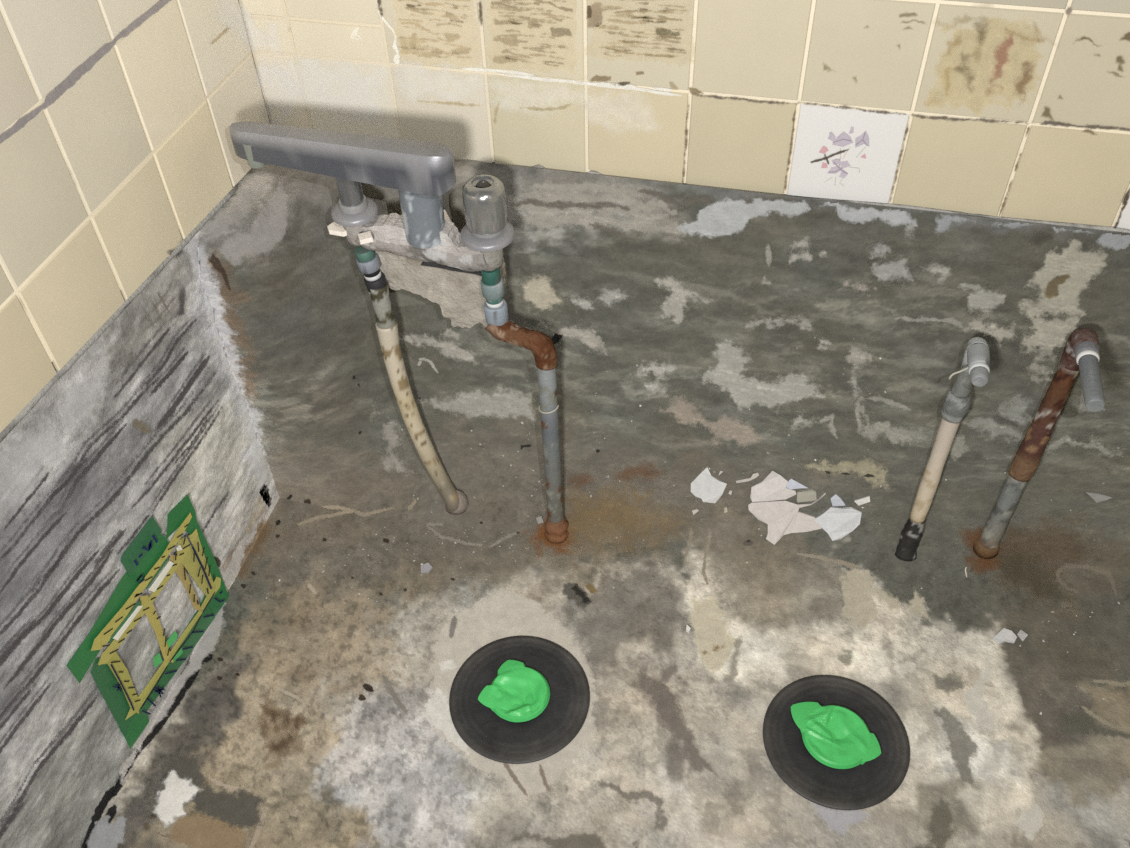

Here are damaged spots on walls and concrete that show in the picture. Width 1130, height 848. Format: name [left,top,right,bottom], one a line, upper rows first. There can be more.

spalling [88,815,125,848]